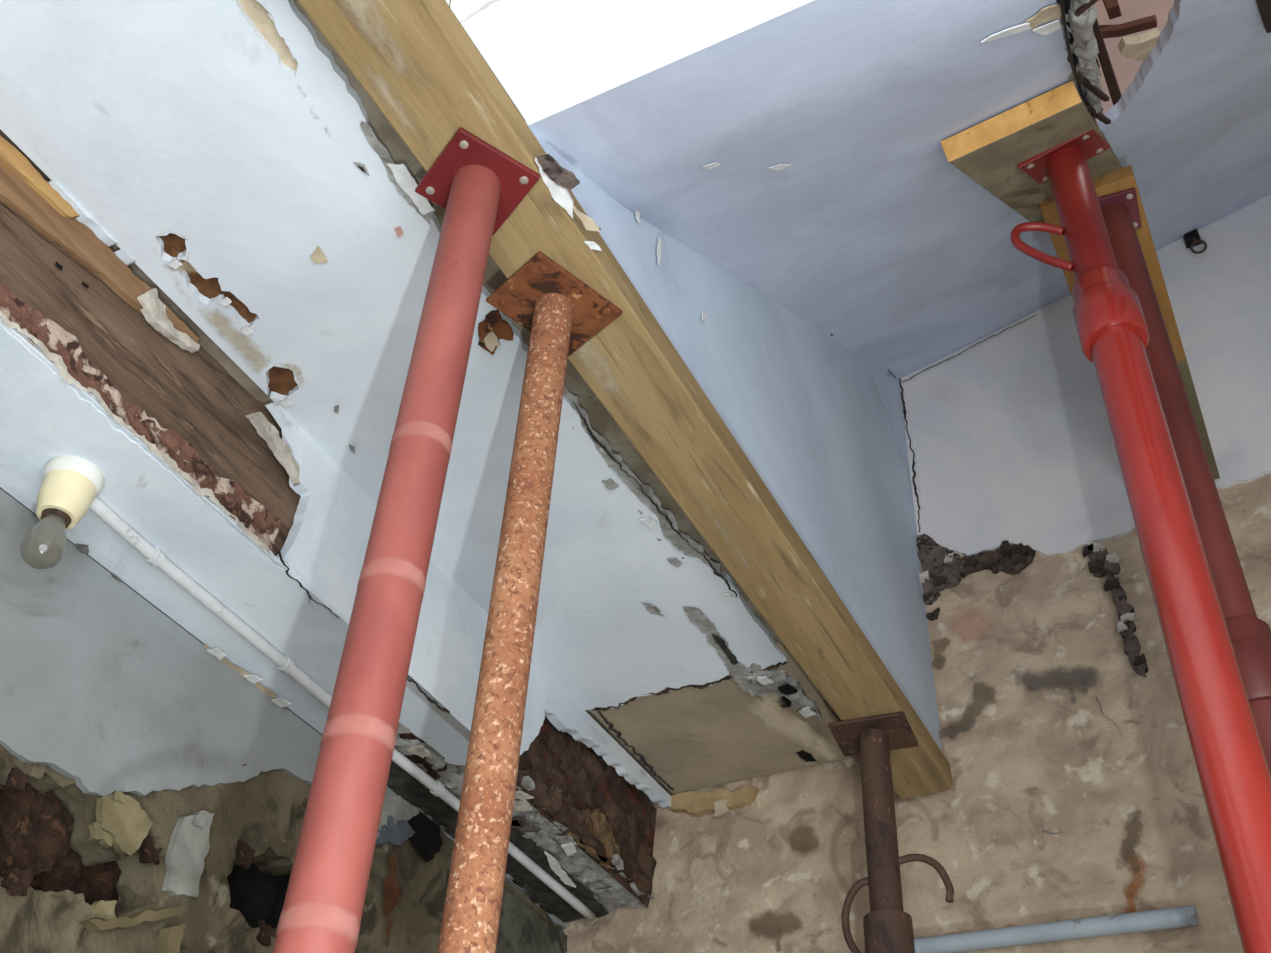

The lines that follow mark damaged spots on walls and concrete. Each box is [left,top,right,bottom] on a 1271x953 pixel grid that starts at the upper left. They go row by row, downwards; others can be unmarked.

peeling [239,0,298,71]
spalling [981,0,1111,124]
spalling [1118,27,1160,61]
spalling [0,135,301,556]
spalling [1217,473,1271,629]
spalling [0,744,311,953]
spalling [355,722,465,953]
spalling [504,606,870,953]
spalling [893,528,1244,953]